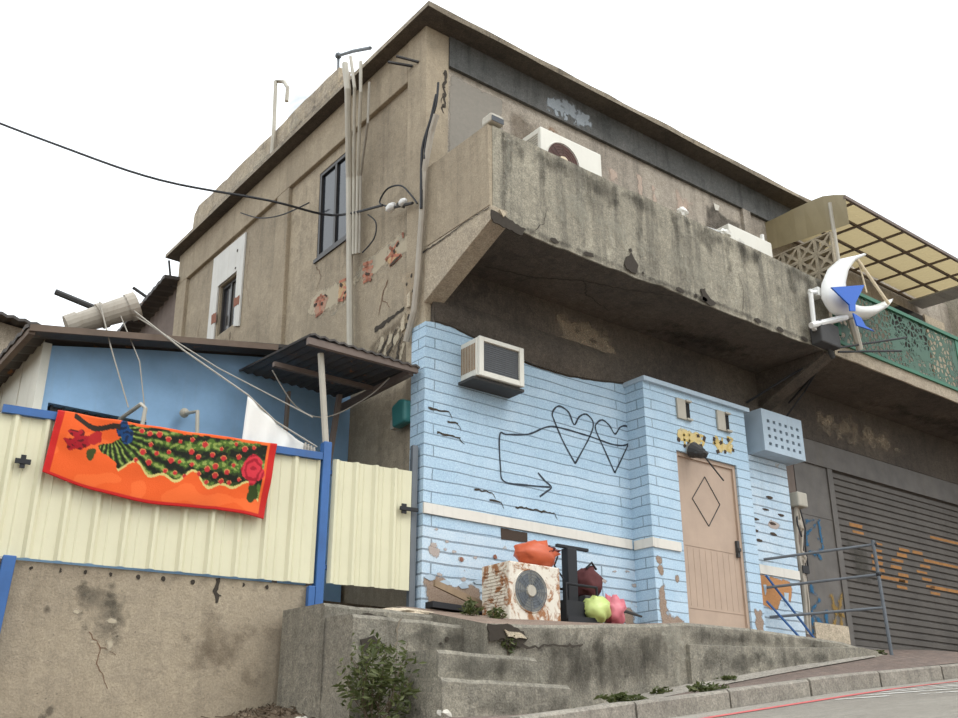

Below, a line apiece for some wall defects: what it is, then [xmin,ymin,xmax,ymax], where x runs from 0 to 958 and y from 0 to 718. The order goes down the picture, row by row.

peeling [547,98,592,127]
leakage [708,203,738,228]
peeling [308,235,407,317]
peeling [429,540,477,562]
peeling [423,573,482,610]
peeling [656,555,684,623]
crack [89,632,116,689]